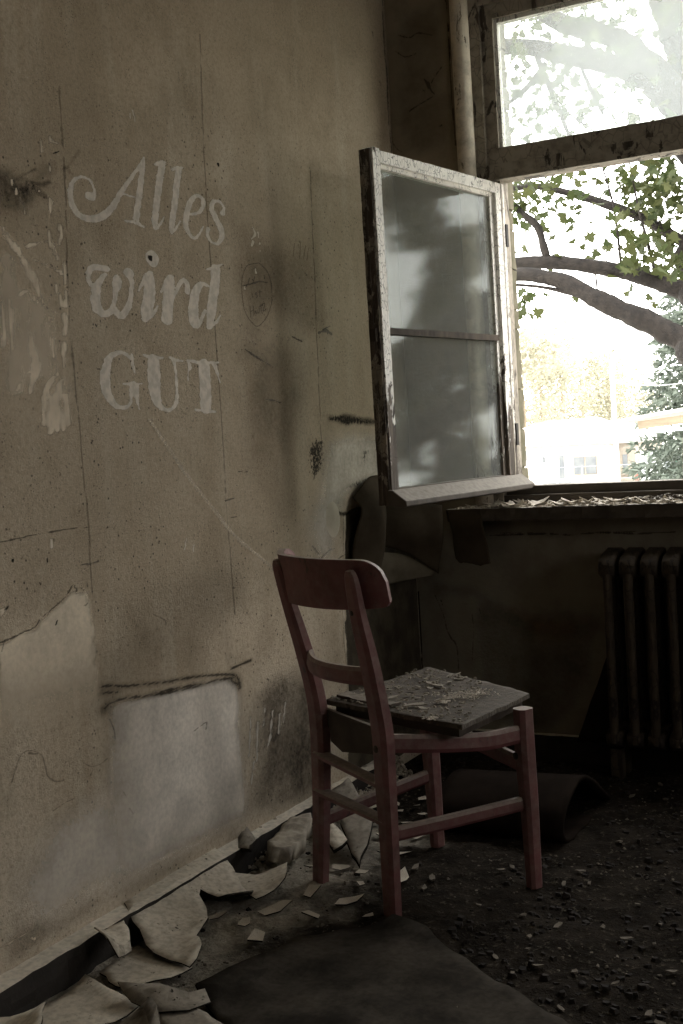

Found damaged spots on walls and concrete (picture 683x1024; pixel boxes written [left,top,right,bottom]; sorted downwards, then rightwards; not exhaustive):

peeling [0,584,95,696]